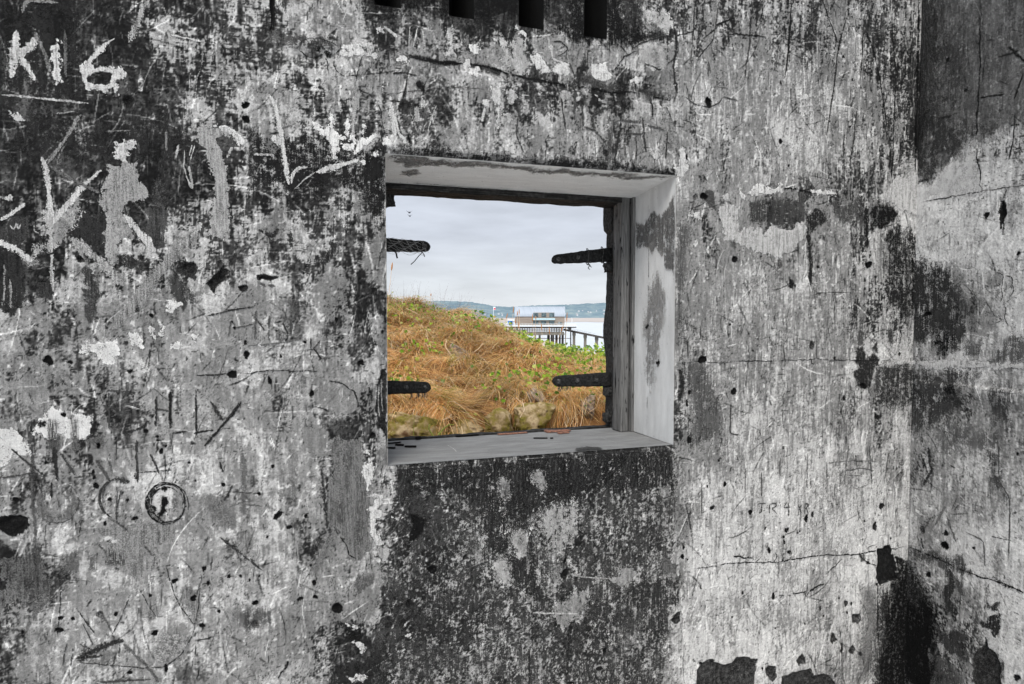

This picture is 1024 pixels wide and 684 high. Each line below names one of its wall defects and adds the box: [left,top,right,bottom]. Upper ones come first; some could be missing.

water stain [918,0,983,184]
water stain [674,220,692,345]
water stain [749,194,813,285]
peeling [0,515,176,634]
water stain [327,357,725,684]
crack [697,538,1024,600]
spalling [859,537,908,639]
spalling [696,654,835,684]